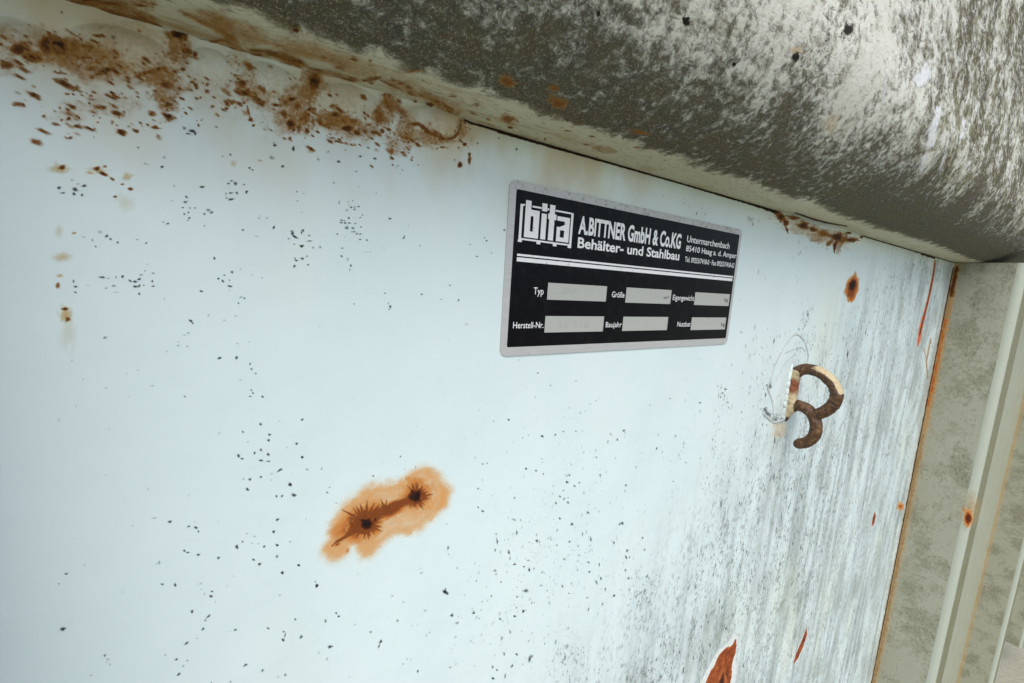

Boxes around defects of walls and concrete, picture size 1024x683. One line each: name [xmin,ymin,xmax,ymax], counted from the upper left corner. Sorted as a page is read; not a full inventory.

rust [0,0,936,345]
rust [323,468,450,560]
rust [871,266,959,683]
rust [963,505,977,528]